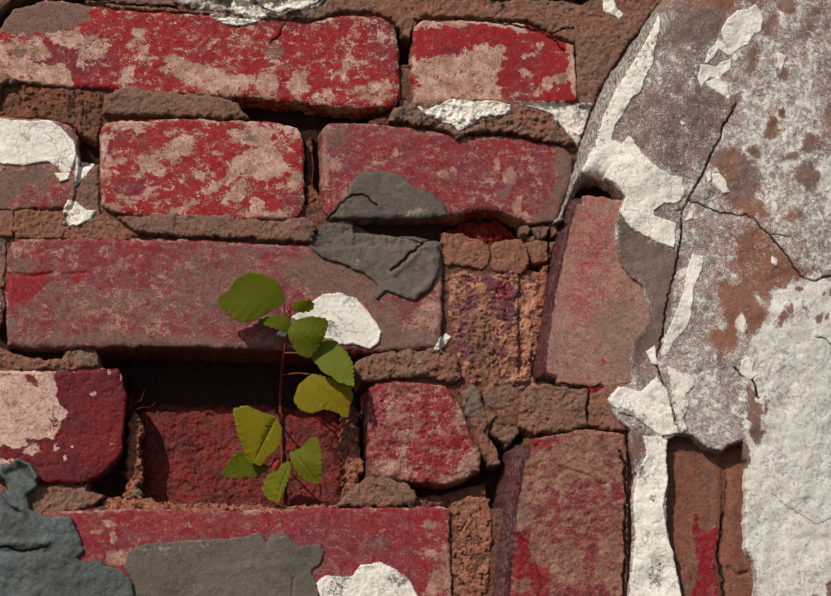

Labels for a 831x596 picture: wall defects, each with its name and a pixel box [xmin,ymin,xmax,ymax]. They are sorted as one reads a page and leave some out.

peeling [210,0,318,26]
peeling [603,0,624,19]
peeling [698,4,763,100]
peeling [777,52,787,71]
peeling [582,15,694,248]
peeling [705,171,731,194]
crack [655,106,831,420]
peeling [737,314,747,335]
peeling [738,357,758,380]
peeling [608,253,704,596]